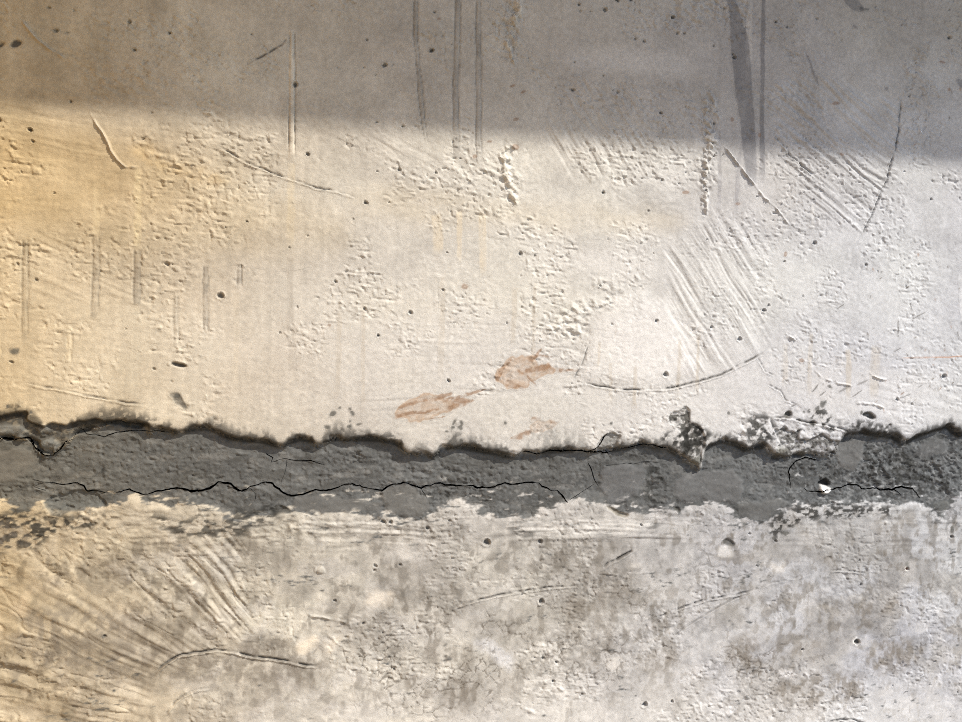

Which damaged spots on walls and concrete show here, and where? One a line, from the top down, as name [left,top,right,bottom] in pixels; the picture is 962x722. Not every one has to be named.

water stain [451,0,462,167]
water stain [474,0,484,171]
water stain [716,0,767,222]
spalling [0,419,144,456]
crack [0,428,165,456]
crack [33,433,666,502]
rust [393,348,577,424]
rust [509,416,559,442]
spalling [667,405,705,470]
spalling [757,358,839,461]
flaking render [817,477,832,495]
crack [788,457,920,498]